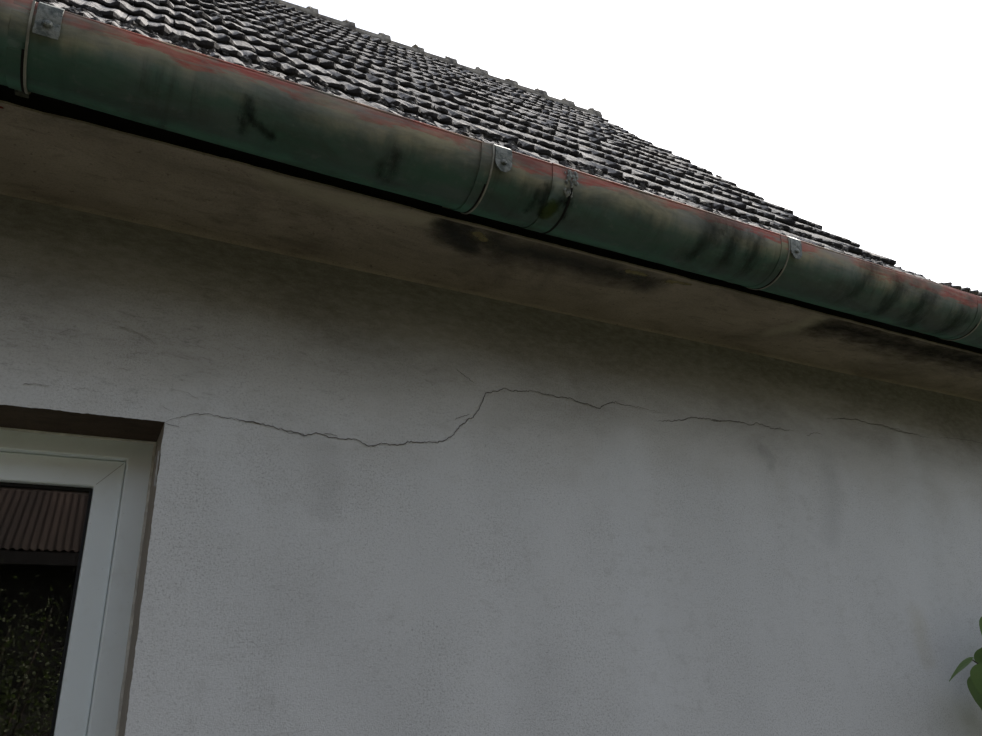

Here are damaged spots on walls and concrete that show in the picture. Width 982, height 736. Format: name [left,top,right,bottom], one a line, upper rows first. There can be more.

water stain [239,167,658,289]
water stain [750,311,982,372]
crack [164,372,980,447]